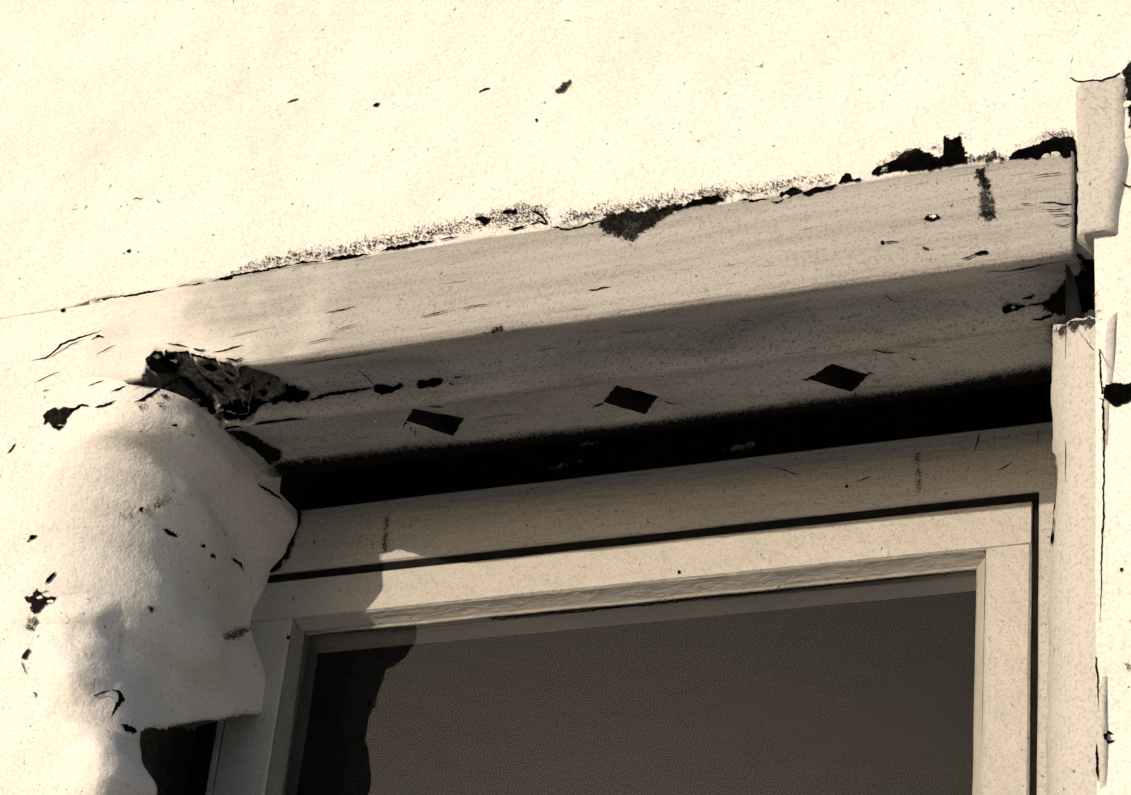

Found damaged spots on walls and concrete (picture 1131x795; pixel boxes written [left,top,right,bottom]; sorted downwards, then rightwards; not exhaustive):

spalling [1122,61,1131,128]
spalling [771,131,970,204]
spalling [1009,126,1077,160]
spalling [658,186,730,212]
spalling [1079,260,1095,313]
spalling [202,363,271,397]
spalling [1098,382,1131,406]
spalling [23,572,56,631]